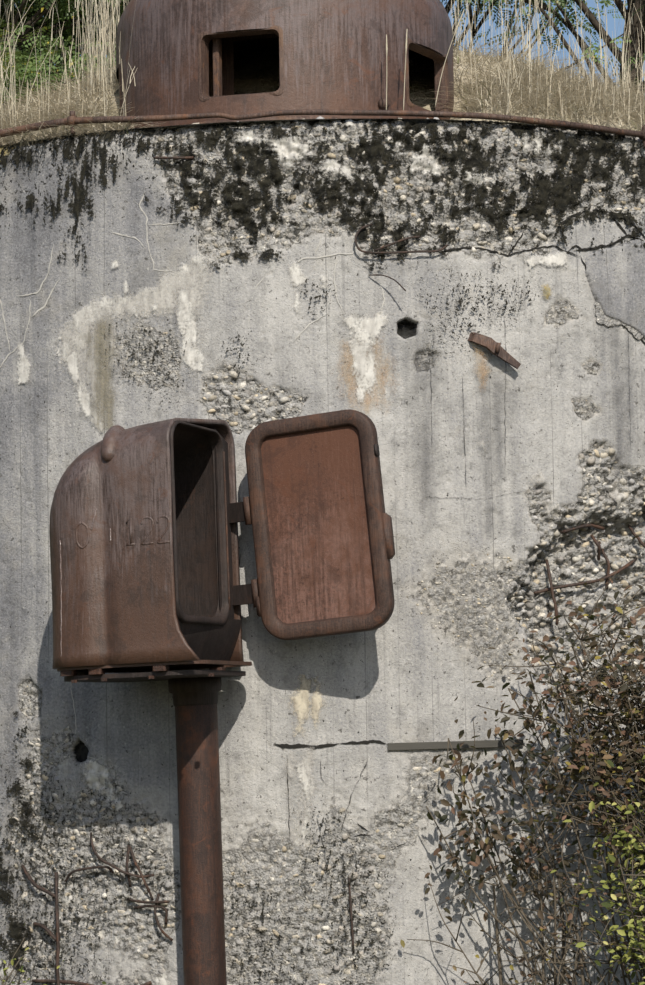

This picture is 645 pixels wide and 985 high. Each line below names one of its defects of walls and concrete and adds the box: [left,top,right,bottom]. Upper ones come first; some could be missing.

leakage [56,252,214,432]
spalling [200,363,309,434]
spalling [150,116,645,263]
spalling [397,319,417,339]
spalling [415,346,438,371]
crack [436,209,645,269]
spalling [546,301,579,324]
spalling [406,441,645,730]
spalling [18,679,41,720]
spalling [2,724,181,985]
crack [273,740,386,891]
spalling [222,748,476,985]